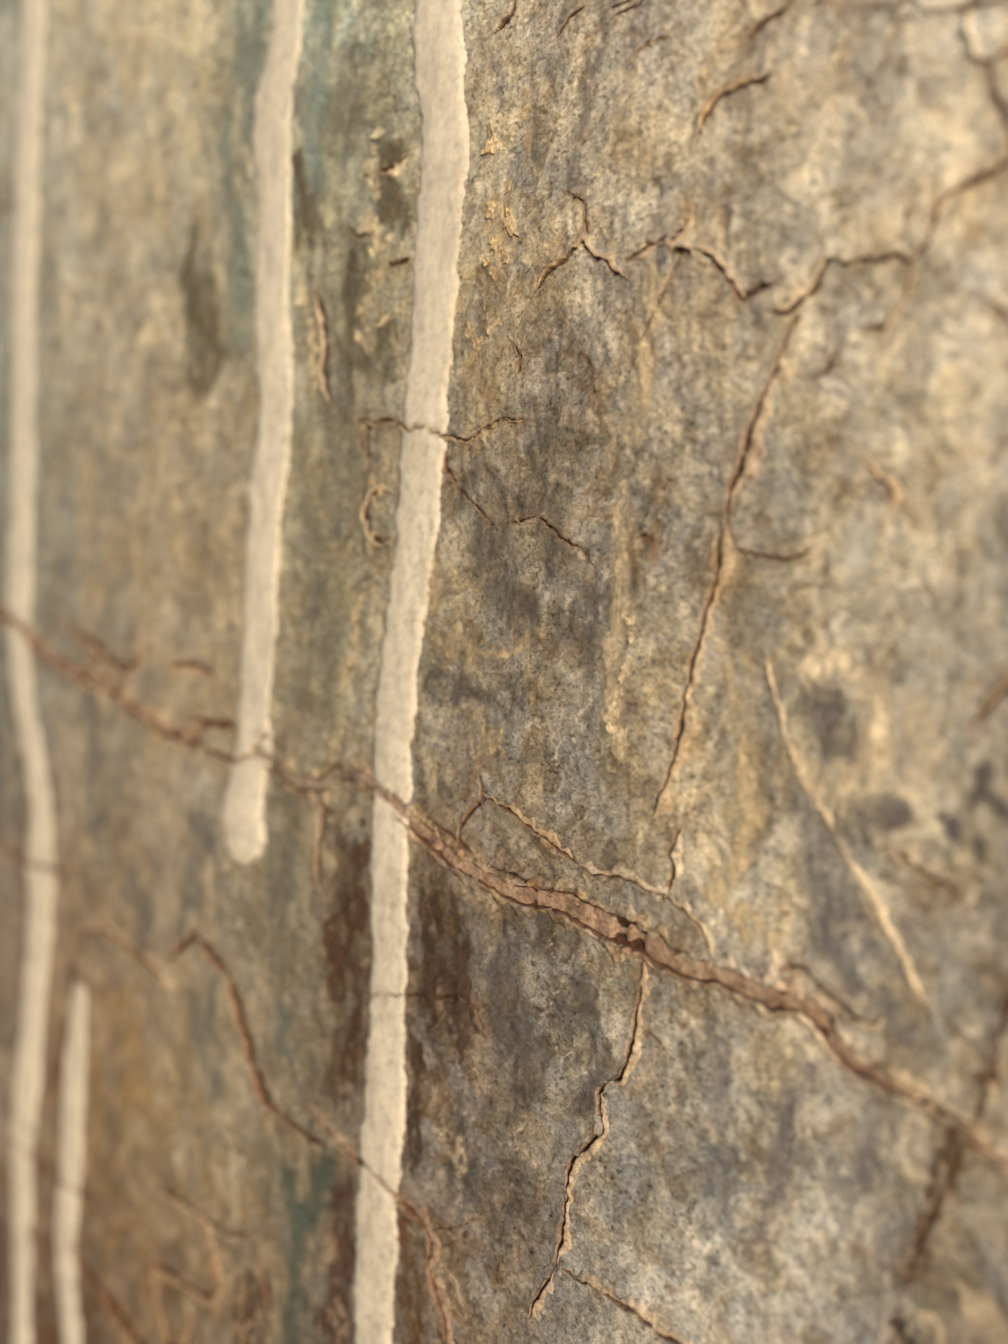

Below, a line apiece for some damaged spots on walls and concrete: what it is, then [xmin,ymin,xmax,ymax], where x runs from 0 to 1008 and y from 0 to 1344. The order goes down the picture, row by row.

damp [234,0,269,126]
damp [290,0,332,251]
crack [355,155,410,183]
damp [377,138,406,235]
crack [494,0,516,33]
damp [180,109,250,392]
damp [344,251,358,335]
crack [380,258,409,267]
crack [313,290,597,570]
crack [534,0,1008,818]
crack [0,600,1008,1344]
damp [449,1118,472,1192]